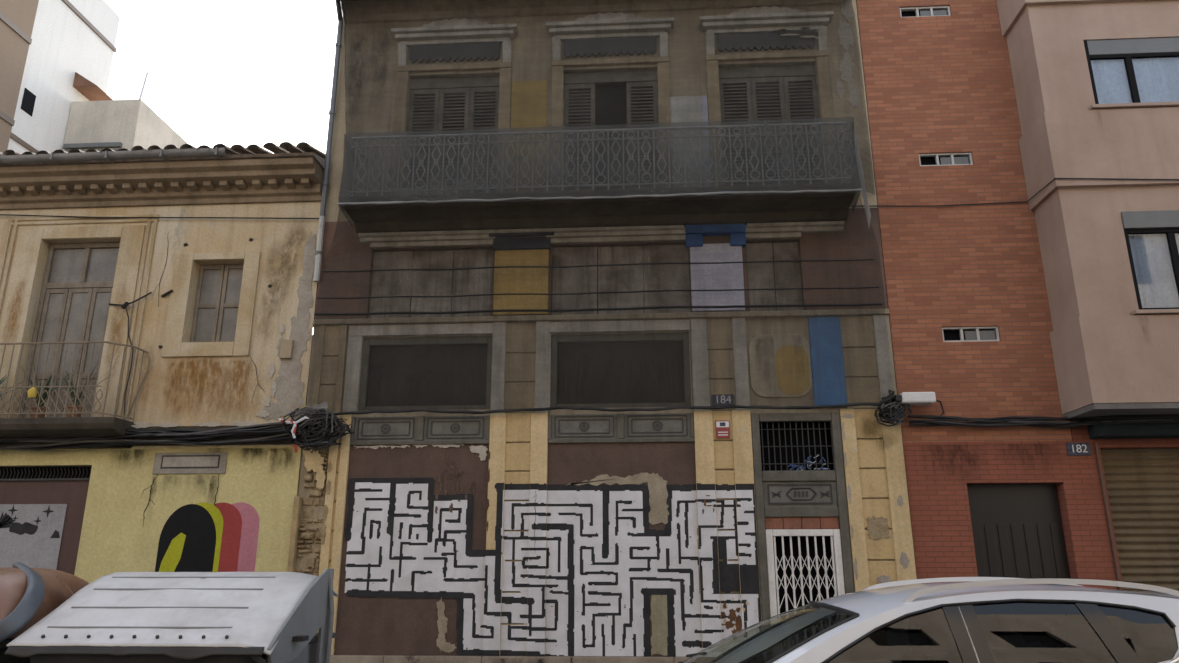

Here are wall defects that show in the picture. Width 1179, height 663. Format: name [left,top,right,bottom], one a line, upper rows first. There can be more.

peeling [131,231,316,429]
flaking render [302,442,326,489]
flaking render [354,444,490,514]
flaking render [567,473,669,525]